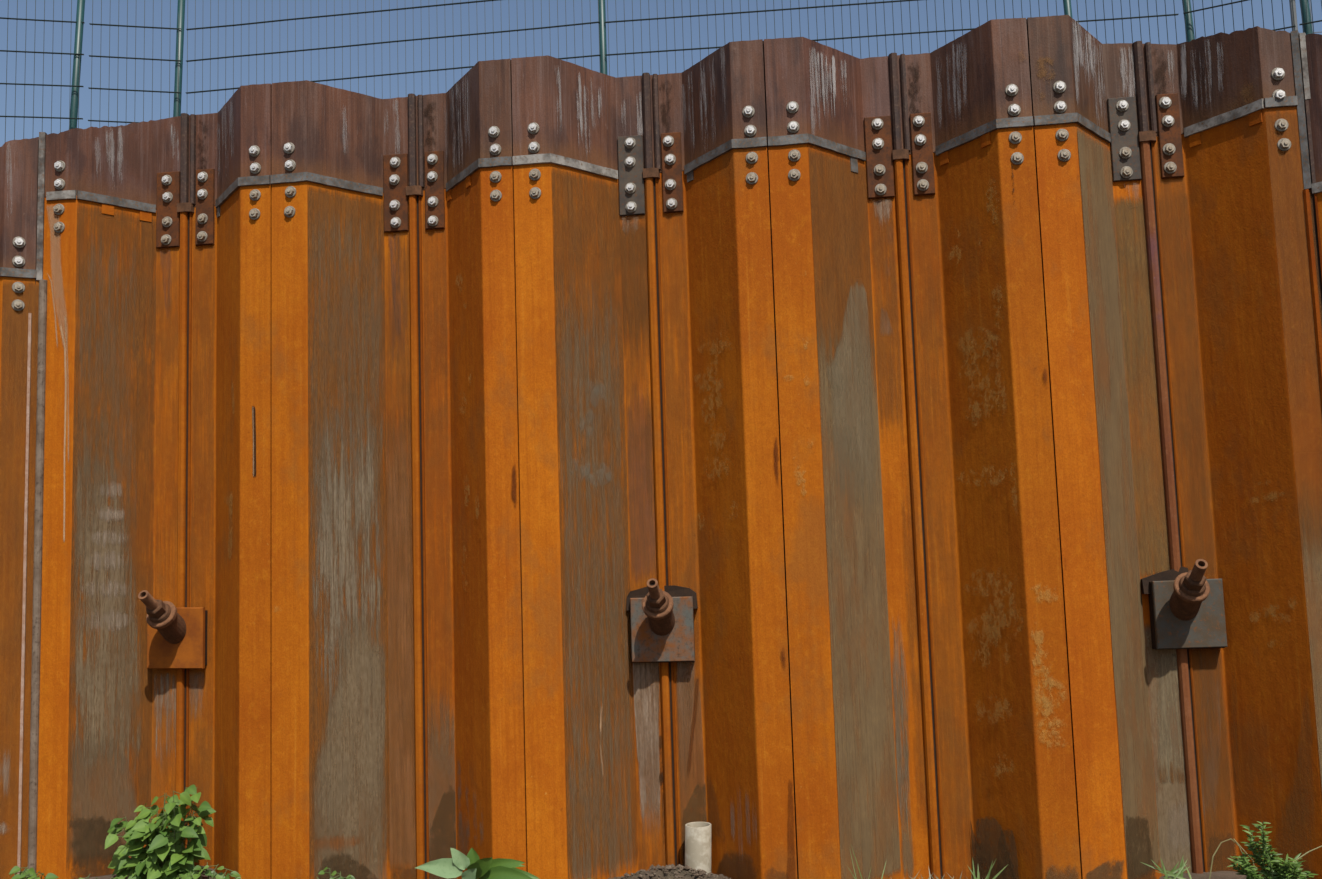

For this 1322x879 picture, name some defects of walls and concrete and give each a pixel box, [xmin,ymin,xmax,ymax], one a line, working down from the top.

leakage [66,206,176,861]
leakage [307,187,454,879]
corrosion [687,680,699,773]
leakage [809,149,913,879]